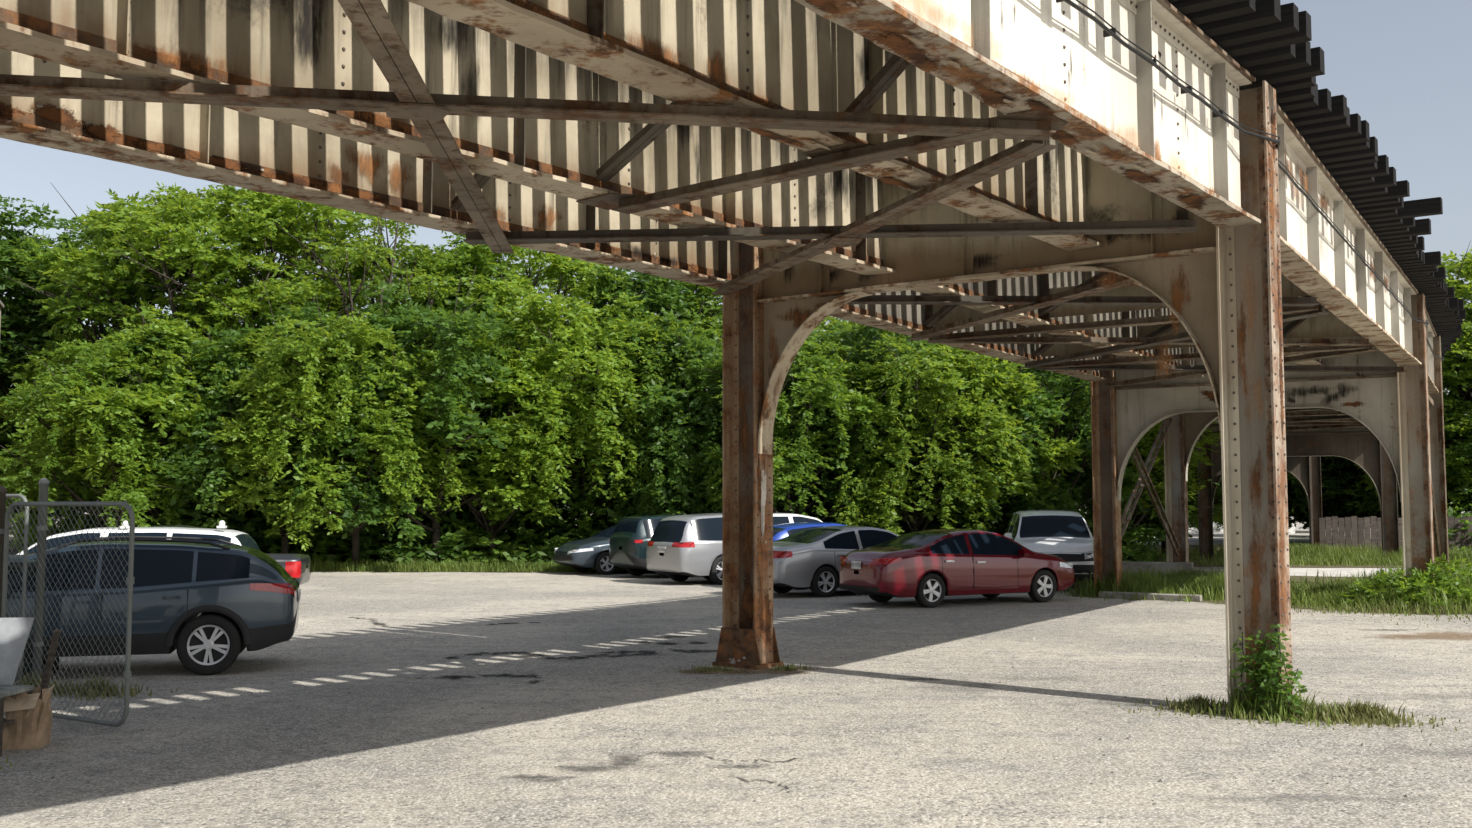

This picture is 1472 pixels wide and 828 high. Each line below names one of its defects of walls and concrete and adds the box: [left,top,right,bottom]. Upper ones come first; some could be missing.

leakage [249,0,318,60]
corrosion [518,2,557,21]
corrosion [628,34,684,71]
corrosion [710,52,727,86]
corrosion [749,93,773,106]
corrosion [331,151,408,192]
corrosion [1270,108,1329,440]
corrosion [781,300,845,328]
corrosion [1237,304,1252,393]
corrosion [739,331,780,641]
corrosion [1251,460,1260,505]
corrosion [1248,487,1285,677]